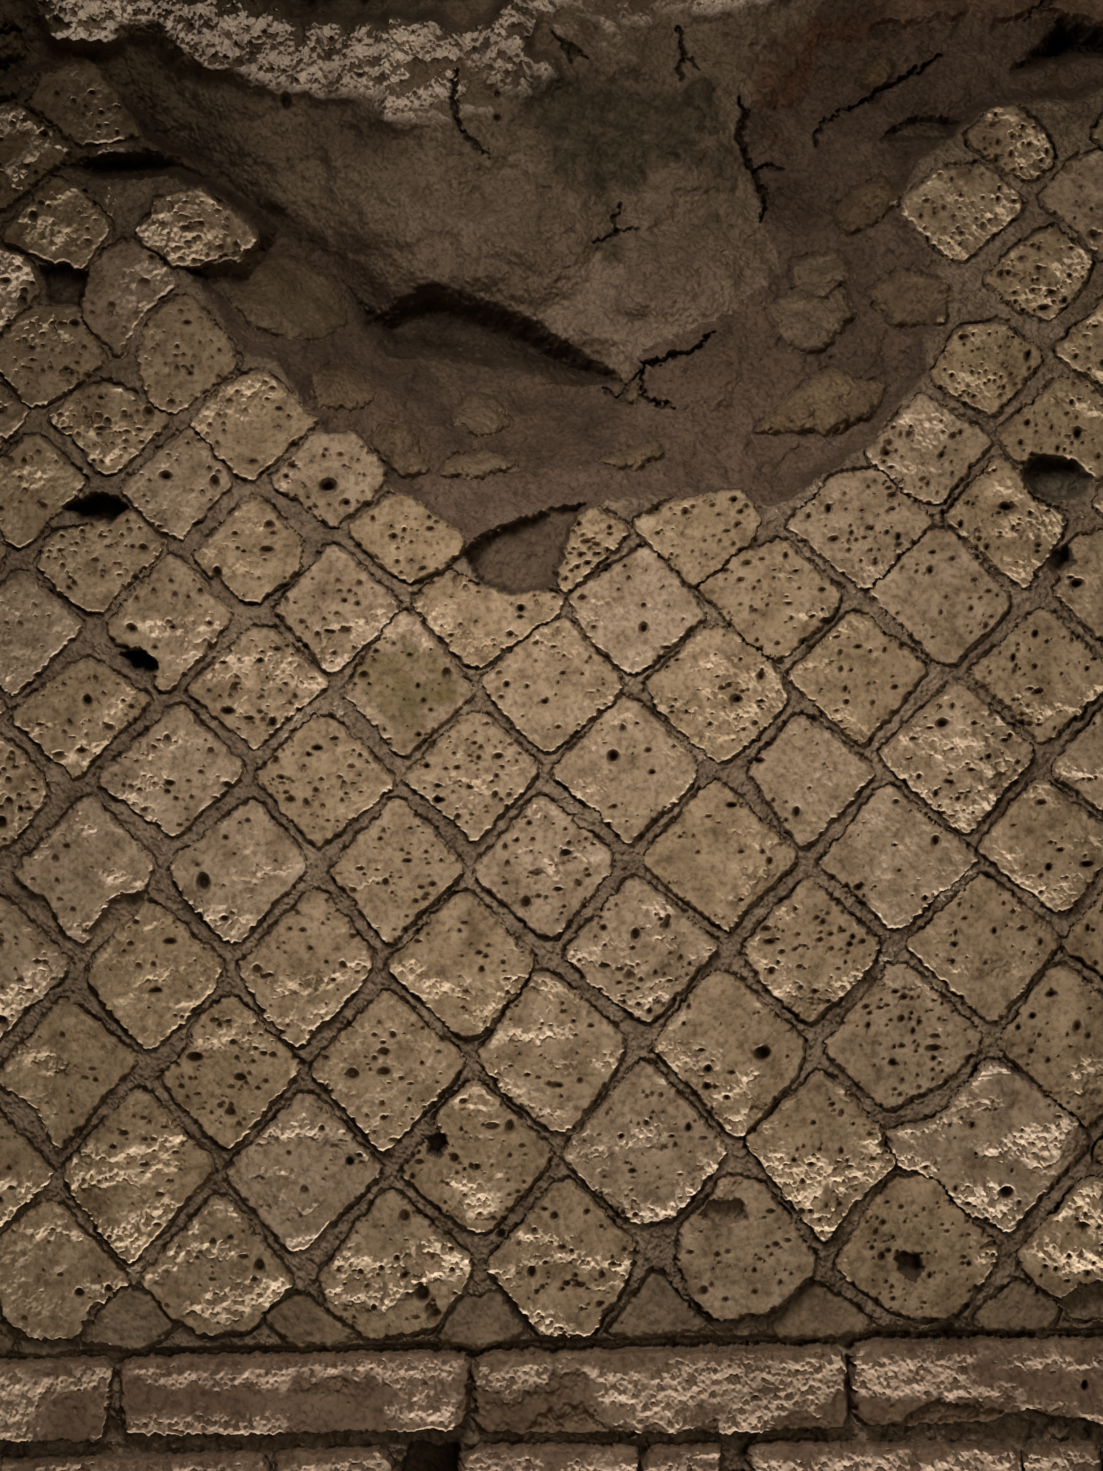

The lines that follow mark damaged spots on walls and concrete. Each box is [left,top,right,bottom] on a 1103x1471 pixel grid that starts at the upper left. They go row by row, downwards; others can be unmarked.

spalling [0,31,62,104]
crack [813,55,944,148]
crack [735,97,786,223]
spalling [40,263,89,307]
spalling [60,15,1103,595]
crack [603,332,716,410]
spalling [401,1440,461,1471]